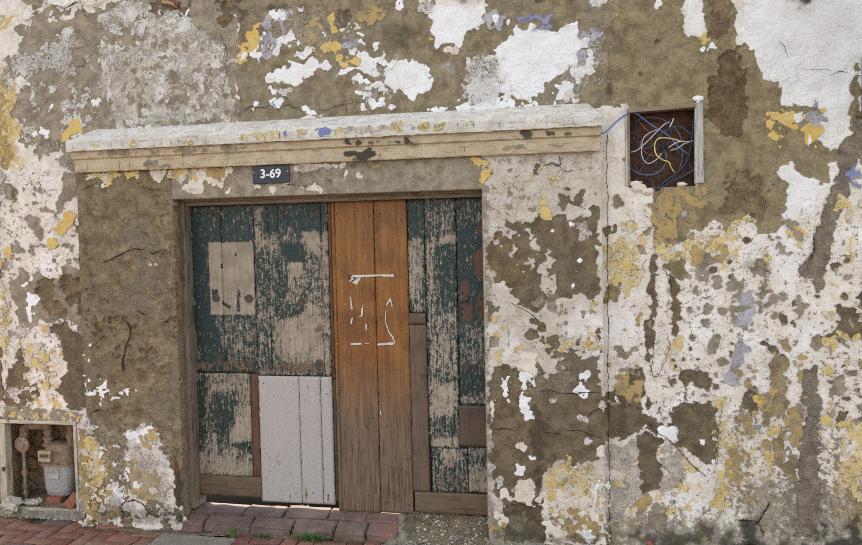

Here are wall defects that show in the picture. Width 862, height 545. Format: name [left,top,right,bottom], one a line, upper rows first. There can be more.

peeling [0,0,862,372]
peeling [486,304,862,545]
leakage [628,519,766,545]
leakage [802,513,862,545]